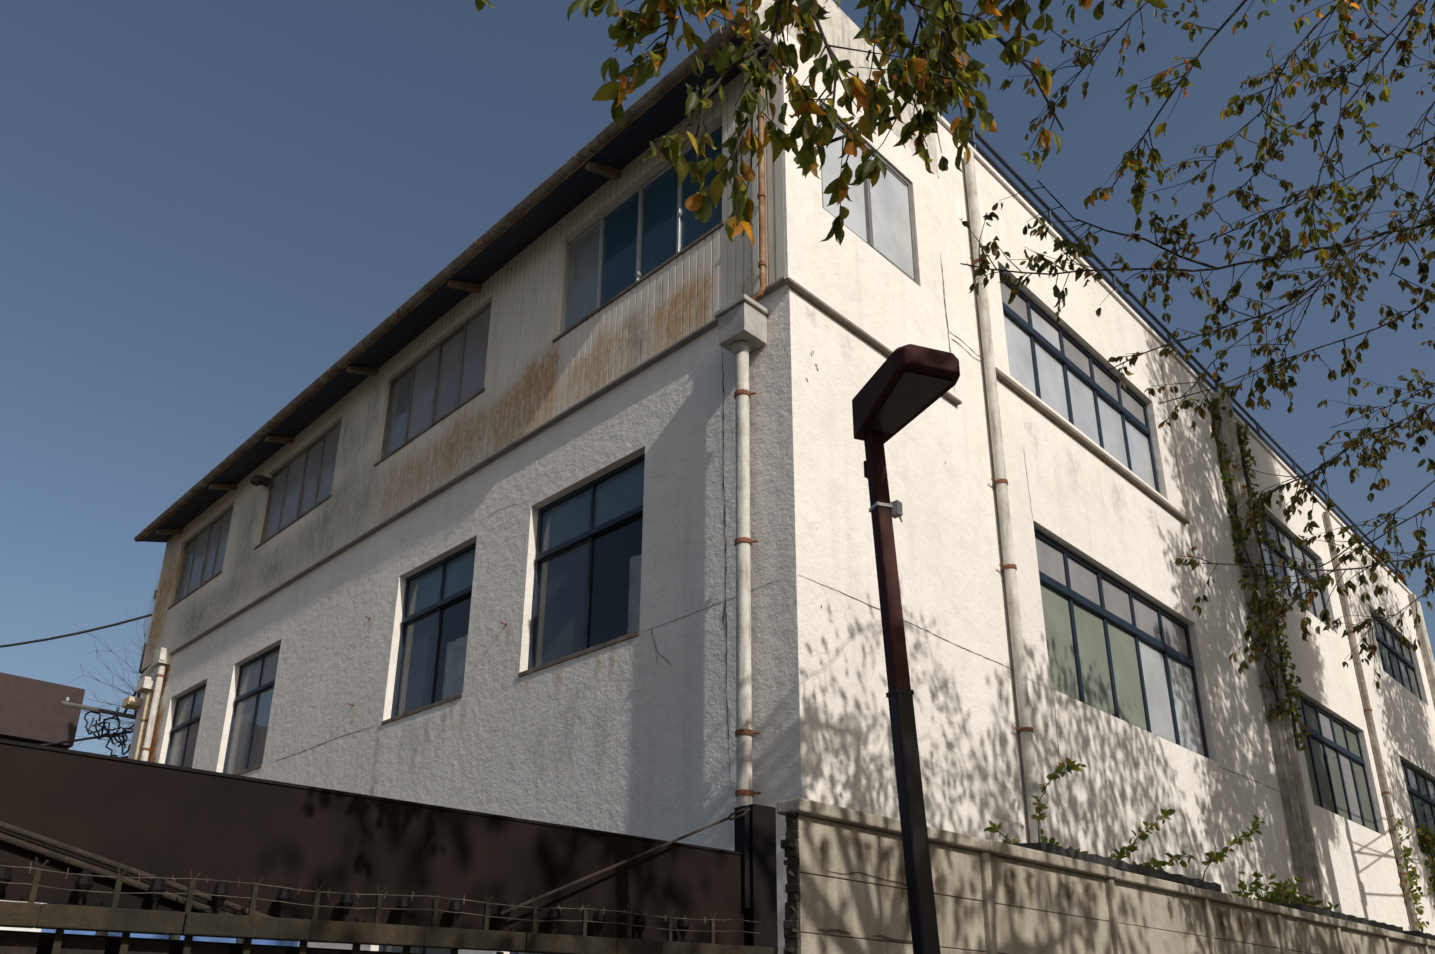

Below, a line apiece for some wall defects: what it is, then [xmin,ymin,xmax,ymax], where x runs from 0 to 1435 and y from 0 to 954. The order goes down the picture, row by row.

crack [643,351,1060,791]
damp [1005,870,1034,897]